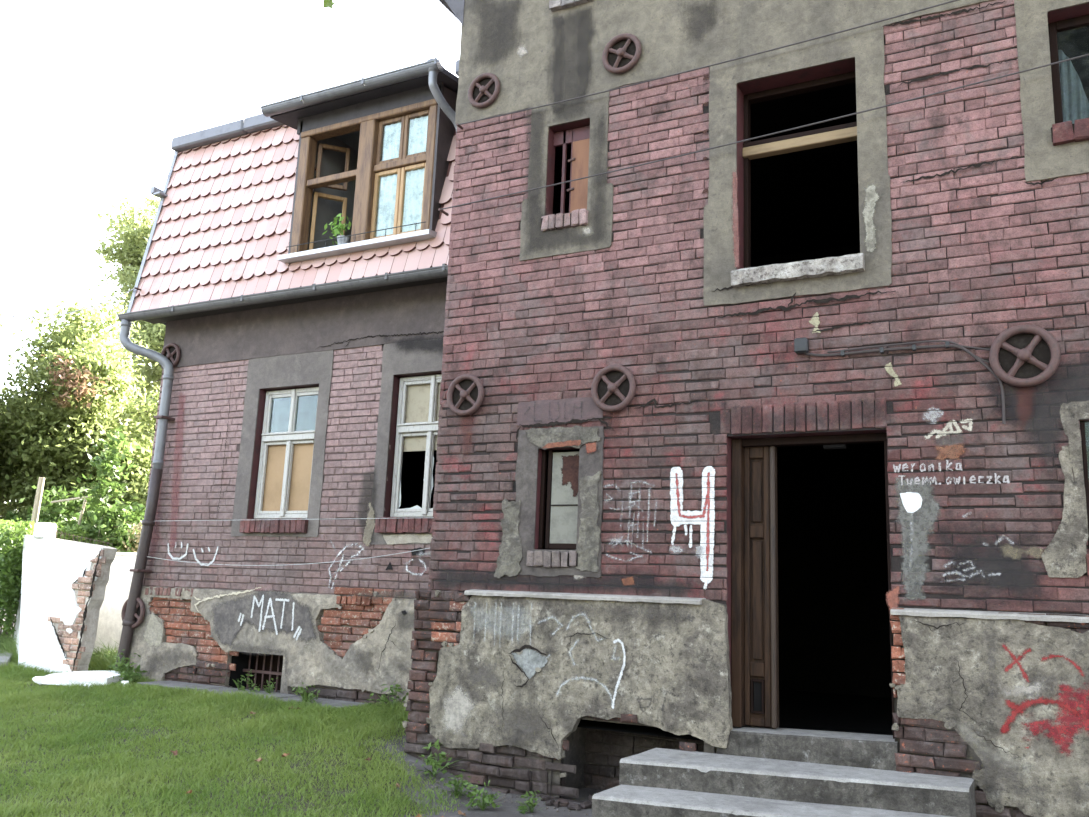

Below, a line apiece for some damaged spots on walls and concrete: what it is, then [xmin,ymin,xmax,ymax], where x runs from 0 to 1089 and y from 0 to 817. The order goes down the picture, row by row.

water stain [477,0,519,62]
crack [901,156,1019,183]
crack [1025,177,1058,185]
crack [715,283,895,332]
crack [315,331,444,350]
flaking render [526,425,601,454]
peeling [886,476,942,698]
spalling [147,597,239,688]
spalling [1014,613,1089,634]
spalling [285,587,716,811]
crack [953,658,1021,758]
spalling [892,713,1033,817]